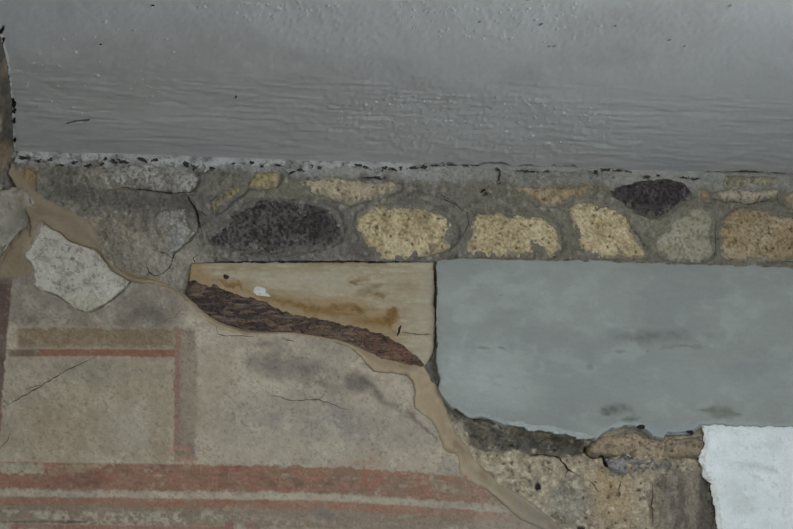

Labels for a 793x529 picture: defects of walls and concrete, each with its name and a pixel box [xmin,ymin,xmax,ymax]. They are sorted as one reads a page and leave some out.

spalling [0,187,38,257]
spalling [25,224,130,313]
crack [125,187,409,276]
crack [397,269,437,361]
crack [2,356,97,407]
spalling [470,420,594,455]
crack [533,454,597,490]
spalling [604,424,722,529]